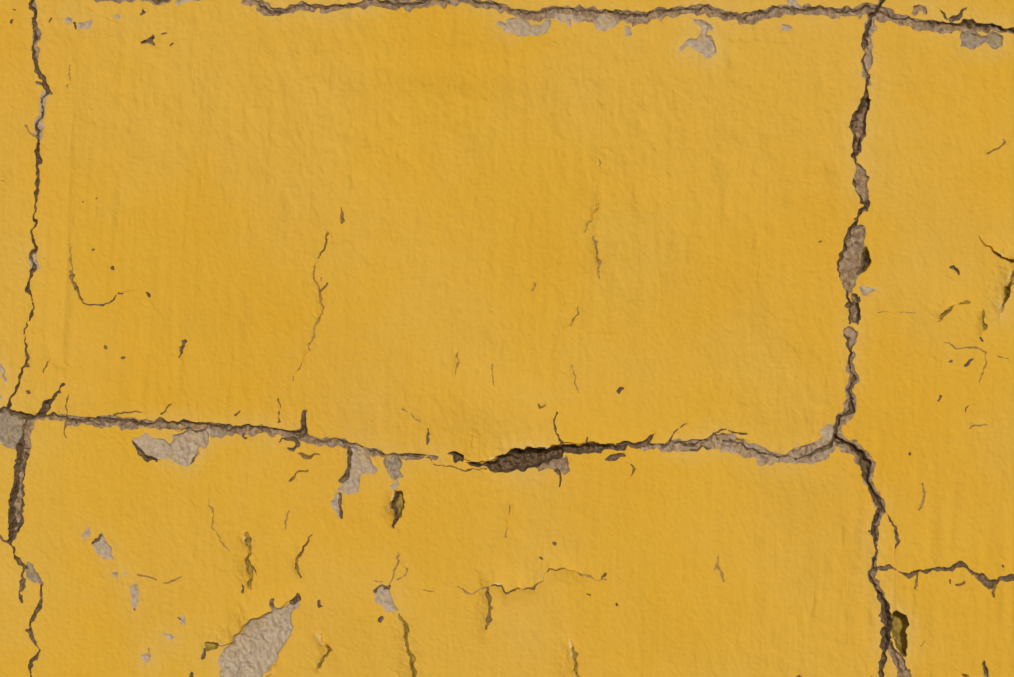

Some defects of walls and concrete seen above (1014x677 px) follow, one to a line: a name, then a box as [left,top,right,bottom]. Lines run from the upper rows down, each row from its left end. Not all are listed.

peeling [679,18,716,59]
crack [0,0,386,677]
crack [241,0,1014,677]
peeling [935,235,1014,342]
spalling [132,427,230,467]
spalling [201,593,301,677]
peeling [373,552,417,677]